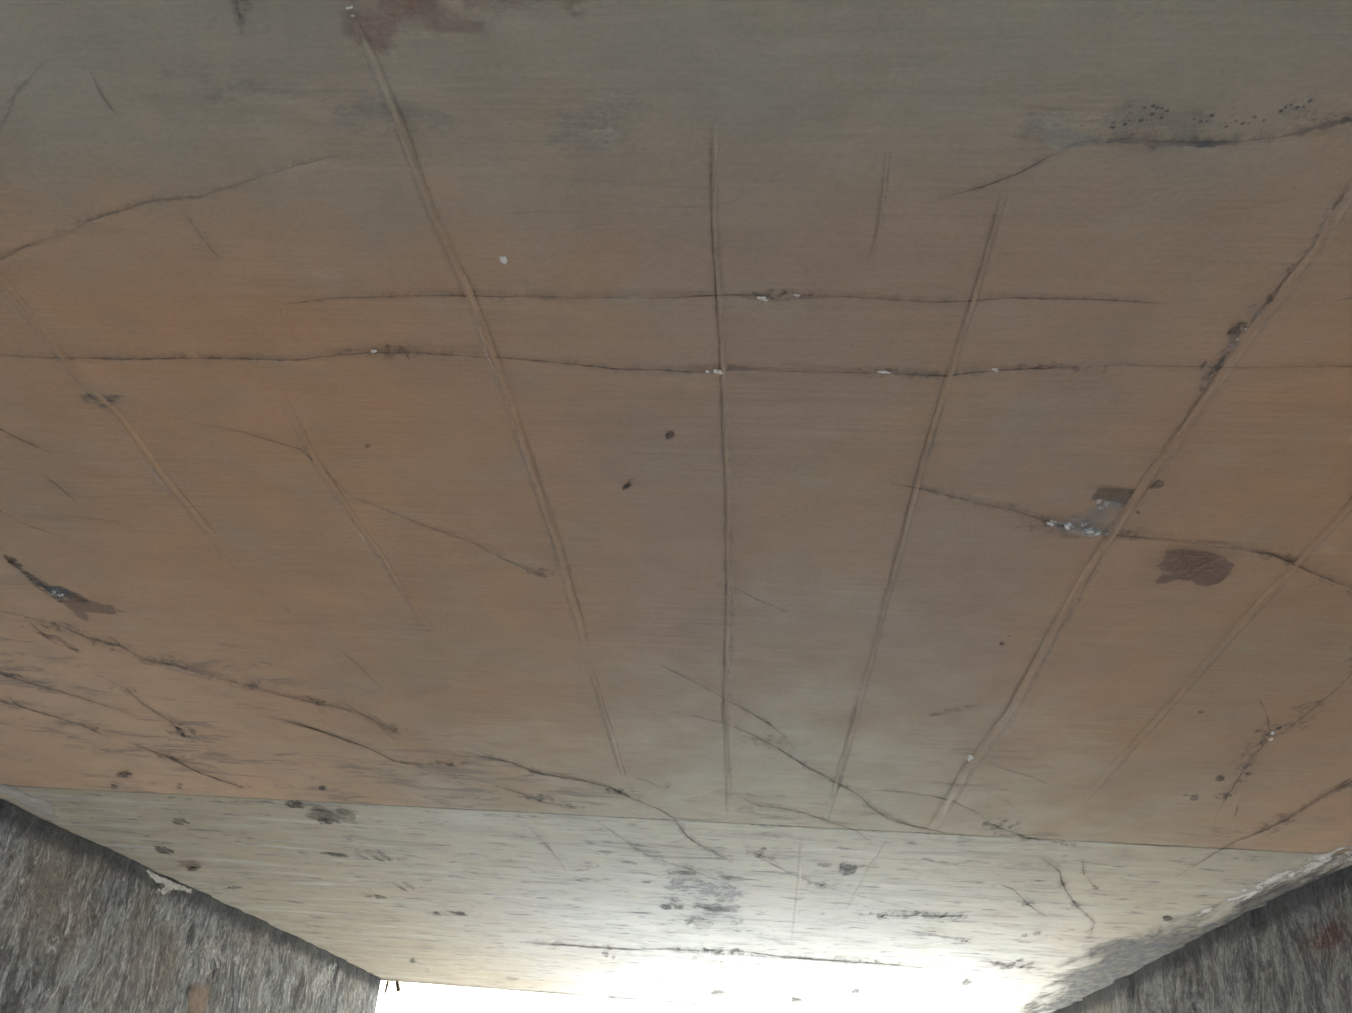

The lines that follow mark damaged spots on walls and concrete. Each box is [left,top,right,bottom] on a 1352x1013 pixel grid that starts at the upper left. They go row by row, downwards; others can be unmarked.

crack [1192,140,1228,148]
crack [698,293,800,301]
crack [848,366,1074,377]
crack [1032,516,1144,538]
spalling [1057,488,1134,535]
damp [1155,549,1234,587]
spalling [5,557,116,619]
crack [1223,702,1281,798]
crack [551,809,895,966]